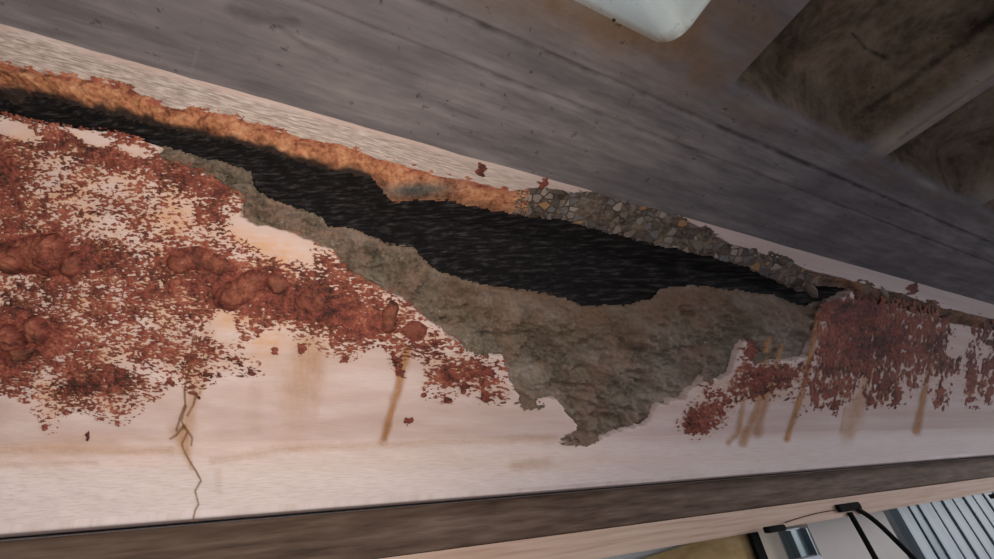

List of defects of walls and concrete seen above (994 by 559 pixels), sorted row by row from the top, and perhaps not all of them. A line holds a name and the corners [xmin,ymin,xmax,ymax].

rust [475,162,487,177]
peeling [0,58,994,447]
rust [906,282,919,297]
crack [172,336,201,518]
rust [384,347,410,439]
rust [785,312,819,441]
rust [914,362,932,433]